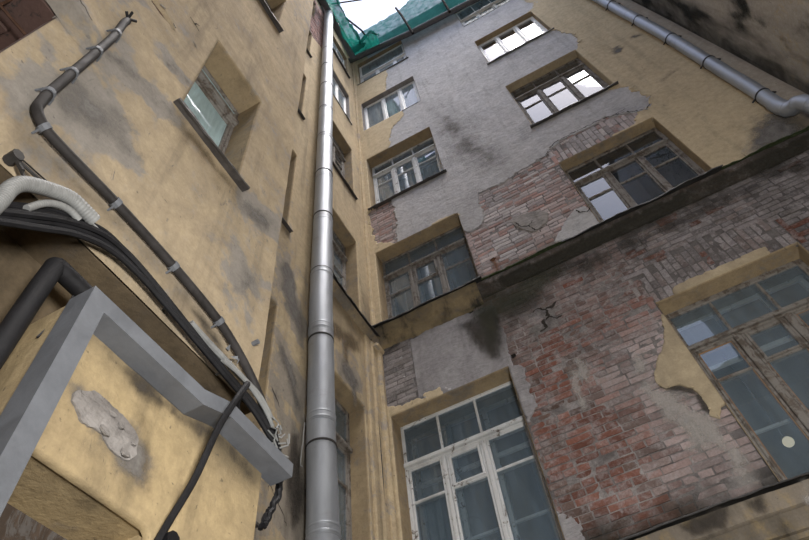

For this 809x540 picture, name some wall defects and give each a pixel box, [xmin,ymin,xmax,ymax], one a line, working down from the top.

flaking render [310,0,324,48]
leakage [668,0,708,21]
leakage [731,0,748,31]
flaking render [367,0,652,278]
leakage [752,113,804,149]
flaking render [383,150,809,540]
flaking render [71,390,139,461]